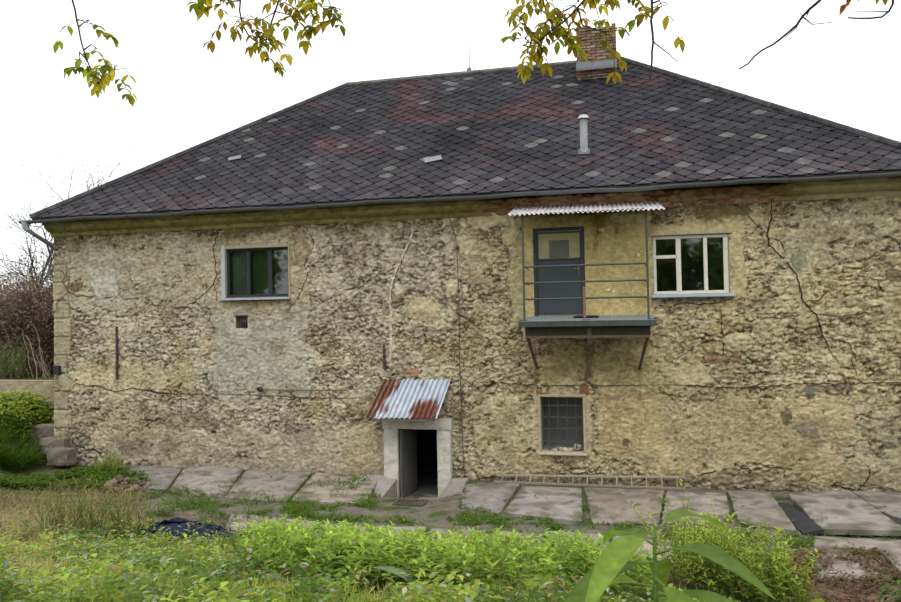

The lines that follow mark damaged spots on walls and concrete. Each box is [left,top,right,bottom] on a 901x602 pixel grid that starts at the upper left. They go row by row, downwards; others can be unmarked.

crack [69,377,367,399]
crack [462,199,901,389]